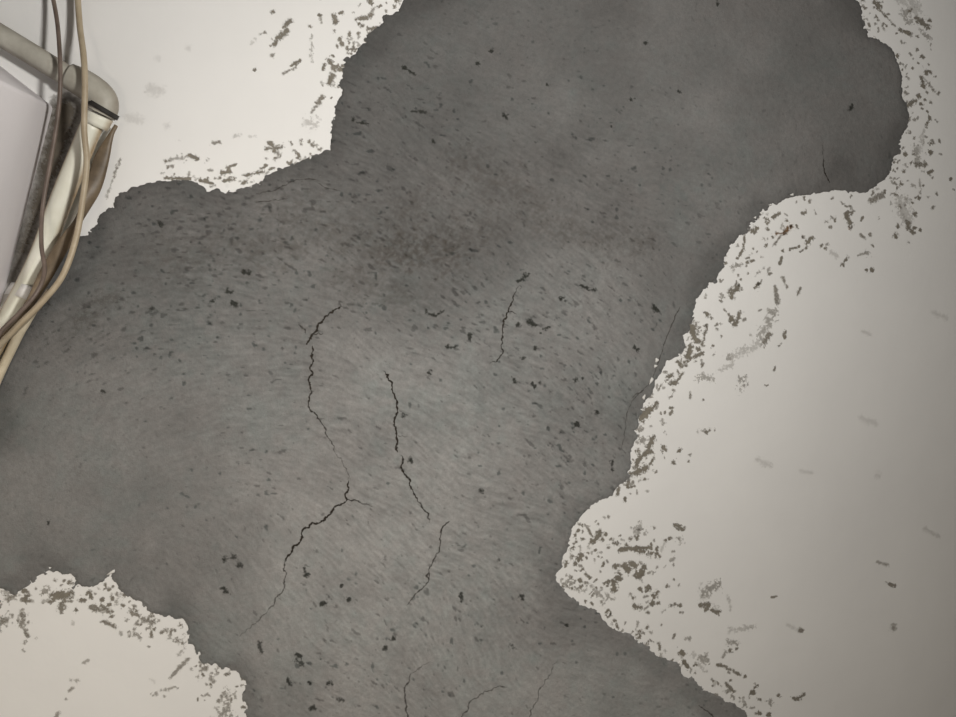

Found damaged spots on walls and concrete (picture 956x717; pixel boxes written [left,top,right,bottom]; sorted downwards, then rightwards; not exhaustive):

crack [300,306,342,452]
crack [492,288,521,362]
crack [274,481,360,603]
crack [385,372,450,605]